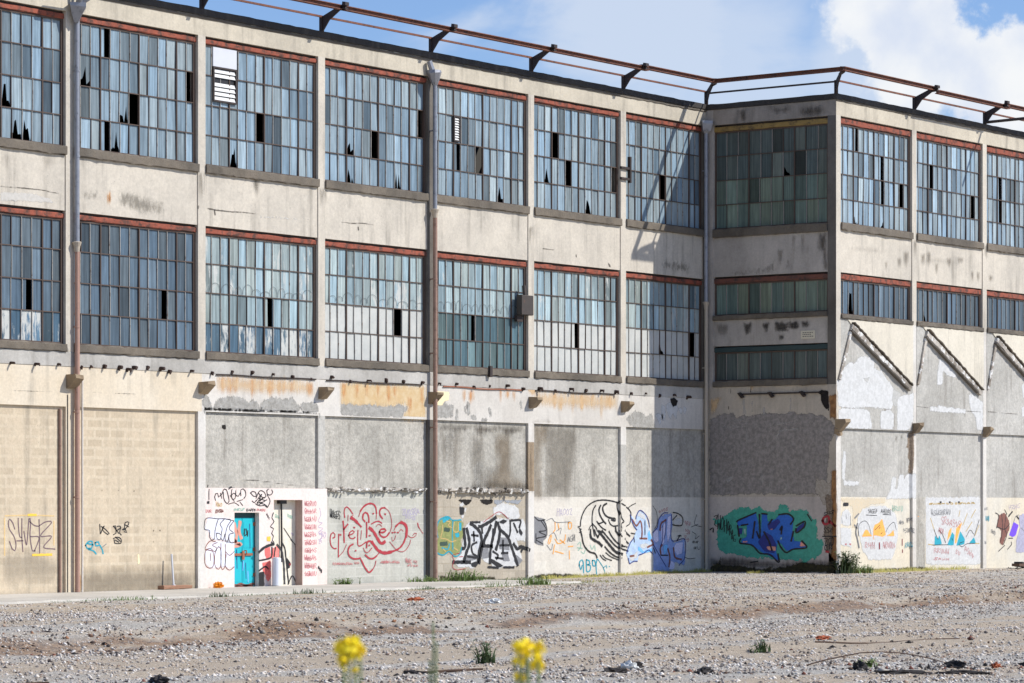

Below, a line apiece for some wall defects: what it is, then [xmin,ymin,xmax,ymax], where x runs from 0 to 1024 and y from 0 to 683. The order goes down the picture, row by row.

rust [220,379,312,394]
rust [341,383,427,421]
rust [530,390,615,408]
peeling [709,356,916,554]